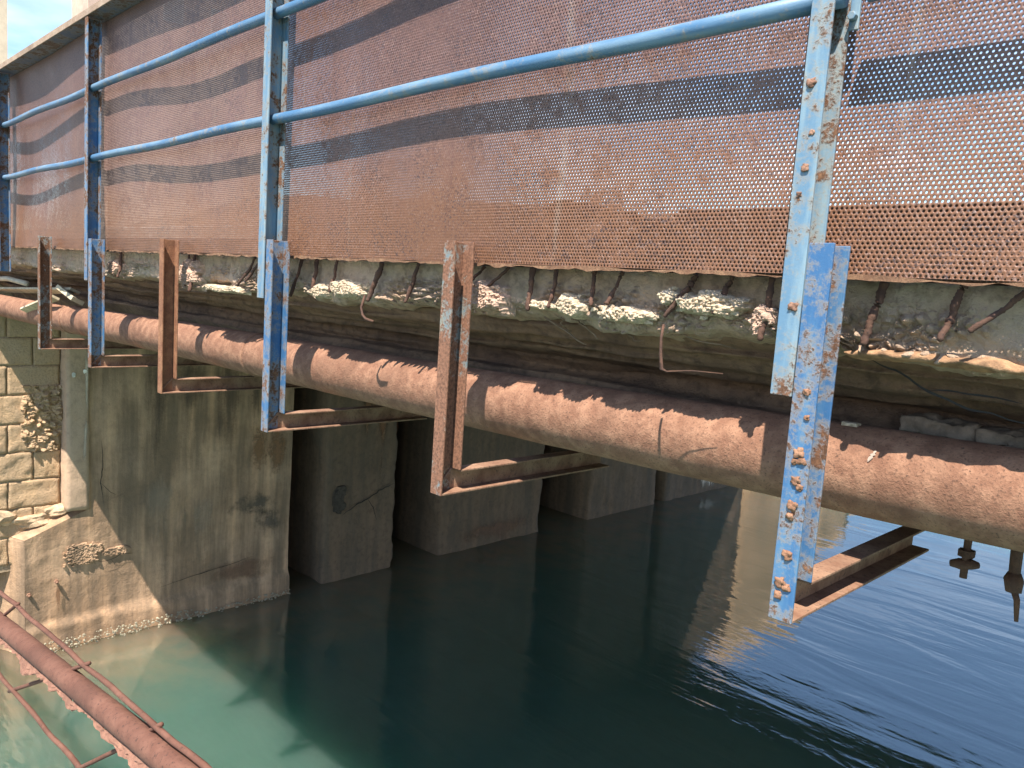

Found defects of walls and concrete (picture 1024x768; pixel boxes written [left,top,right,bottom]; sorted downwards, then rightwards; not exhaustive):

spalling [179,254,258,296]
spalling [289,259,384,302]
spalling [471,265,779,341]
spalling [860,281,890,347]
spalling [936,285,969,342]
spalling [967,290,1024,333]
spalling [20,384,63,452]
spalling [63,542,131,568]